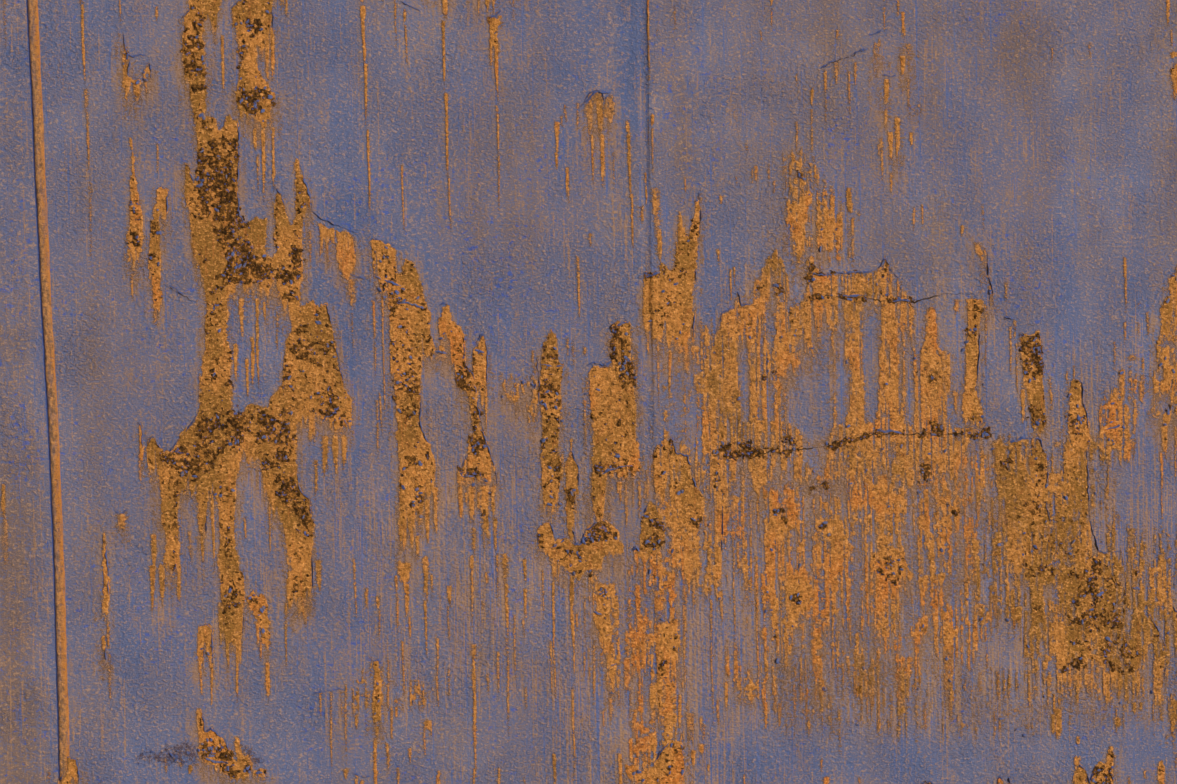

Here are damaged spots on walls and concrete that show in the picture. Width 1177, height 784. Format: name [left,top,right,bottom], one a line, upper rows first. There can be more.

crack [789,293,970,308]
peeling [1096,257,1150,465]
crack [718,429,995,457]